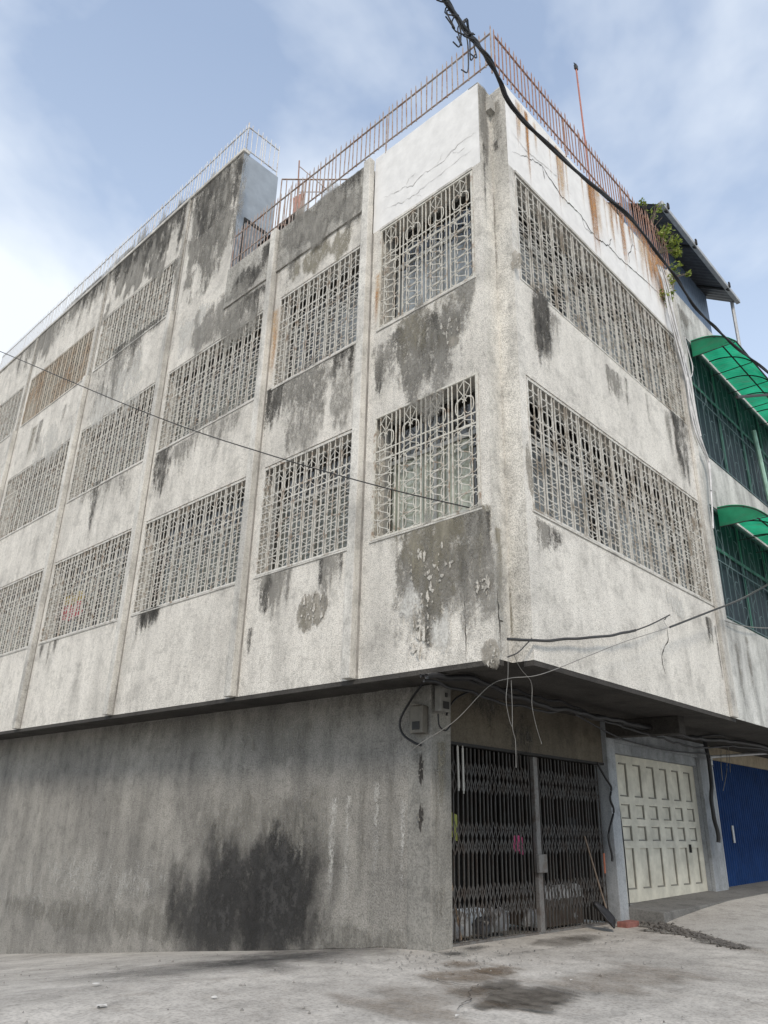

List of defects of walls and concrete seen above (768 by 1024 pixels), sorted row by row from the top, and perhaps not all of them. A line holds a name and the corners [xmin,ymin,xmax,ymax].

damp [17,152,248,370]
crack [385,136,470,206]
damp [479,85,501,175]
crack [511,130,663,298]
rust [581,178,667,294]
damp [265,346,354,429]
damp [373,278,475,403]
damp [533,290,559,364]
peeling [409,541,463,659]
damp [395,505,513,652]
spalling [475,573,493,599]
damp [8,779,406,951]